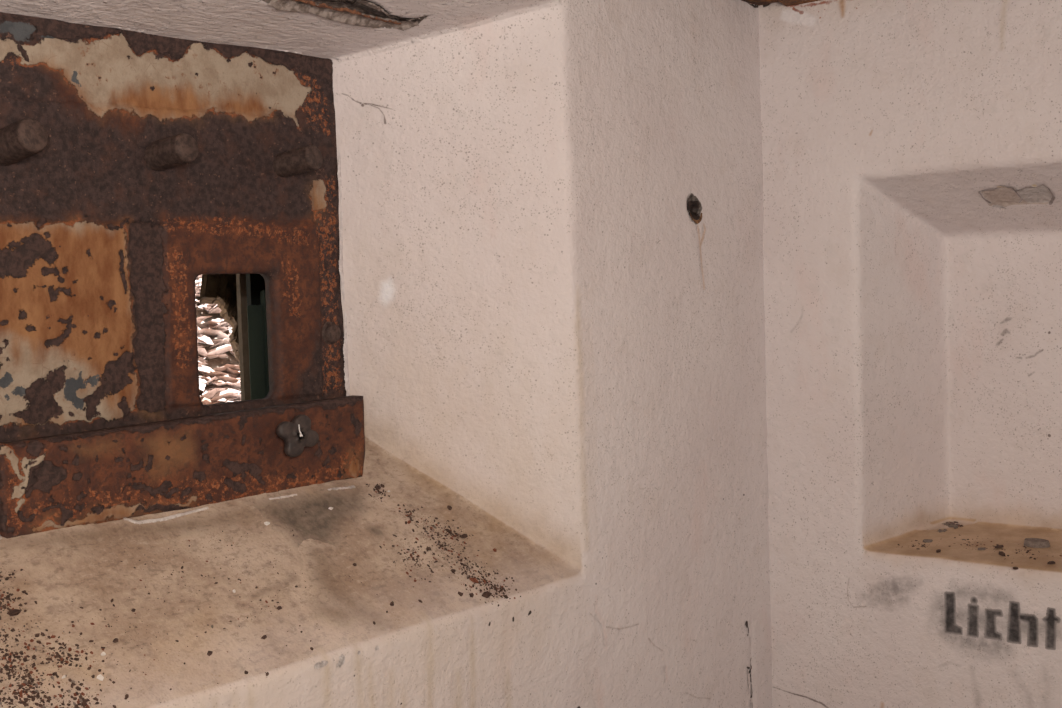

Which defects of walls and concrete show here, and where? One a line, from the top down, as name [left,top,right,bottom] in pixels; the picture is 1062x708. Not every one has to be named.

spalling [258,0,432,31]
water stain [0,481,409,708]
crack [745,621,829,708]